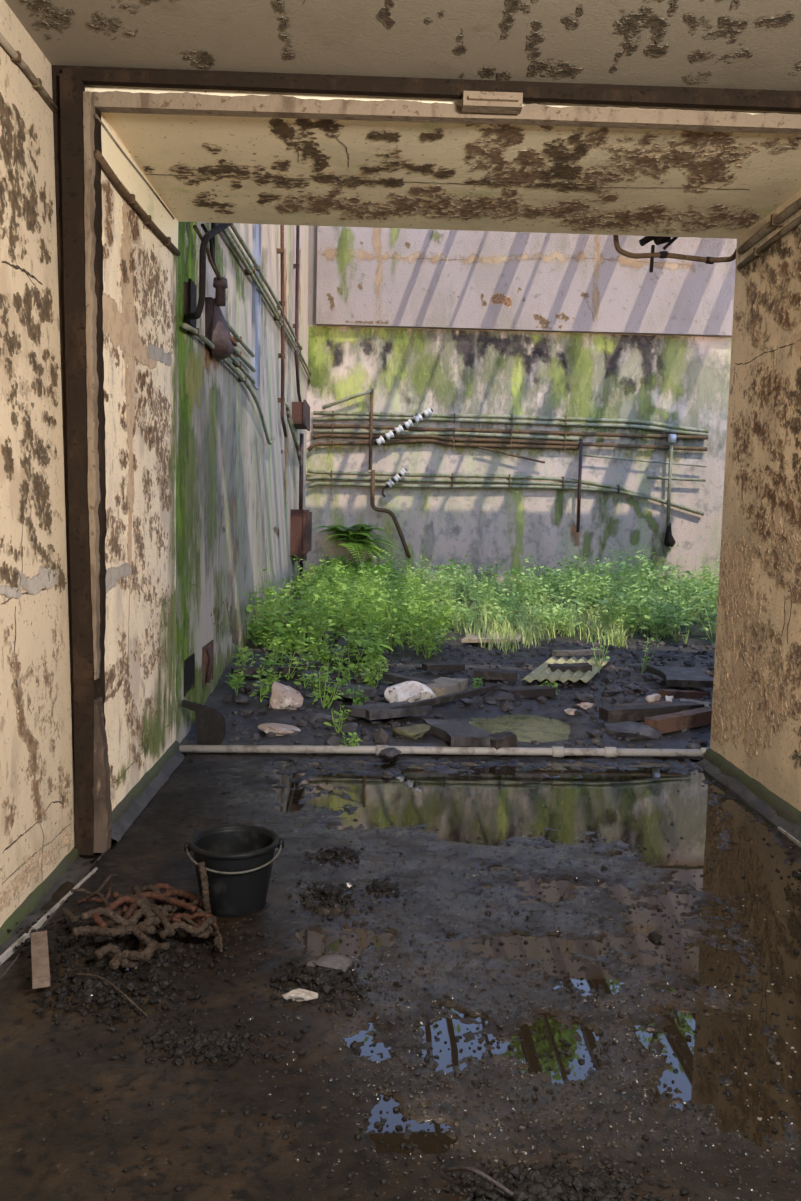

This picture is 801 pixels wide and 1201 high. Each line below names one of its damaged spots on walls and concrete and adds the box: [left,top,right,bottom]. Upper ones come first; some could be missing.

peeling [0,92,54,265]
peeling [144,118,801,234]
peeling [0,283,65,599]
peeling [101,180,176,771]
damp [142,222,264,758]
damp [308,326,342,387]
damp [360,336,402,371]
damp [555,489,564,525]
damp [453,330,688,458]
damp [574,492,665,570]
peeling [711,224,801,769]
spalling [0,624,74,912]